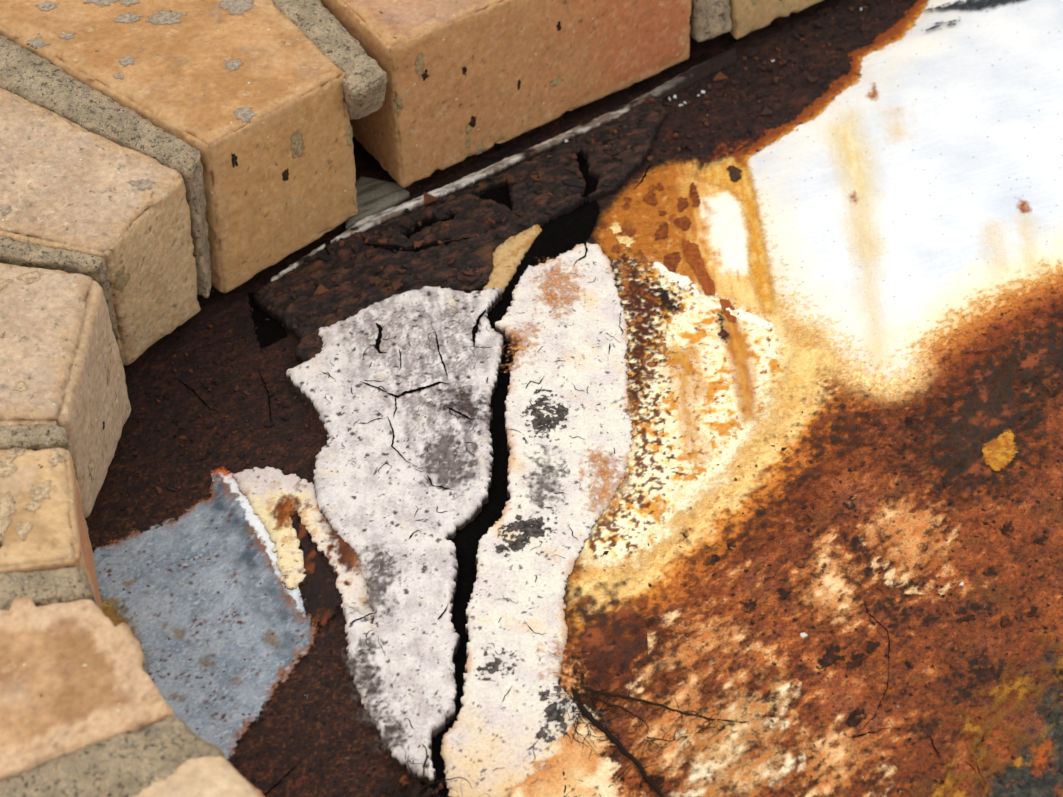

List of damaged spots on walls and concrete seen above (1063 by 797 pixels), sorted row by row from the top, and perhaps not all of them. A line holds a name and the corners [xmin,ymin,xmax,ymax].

rust [137,307,323,470]
peeling [93,466,374,760]
rust [306,192,479,318]
crack [323,185,600,797]